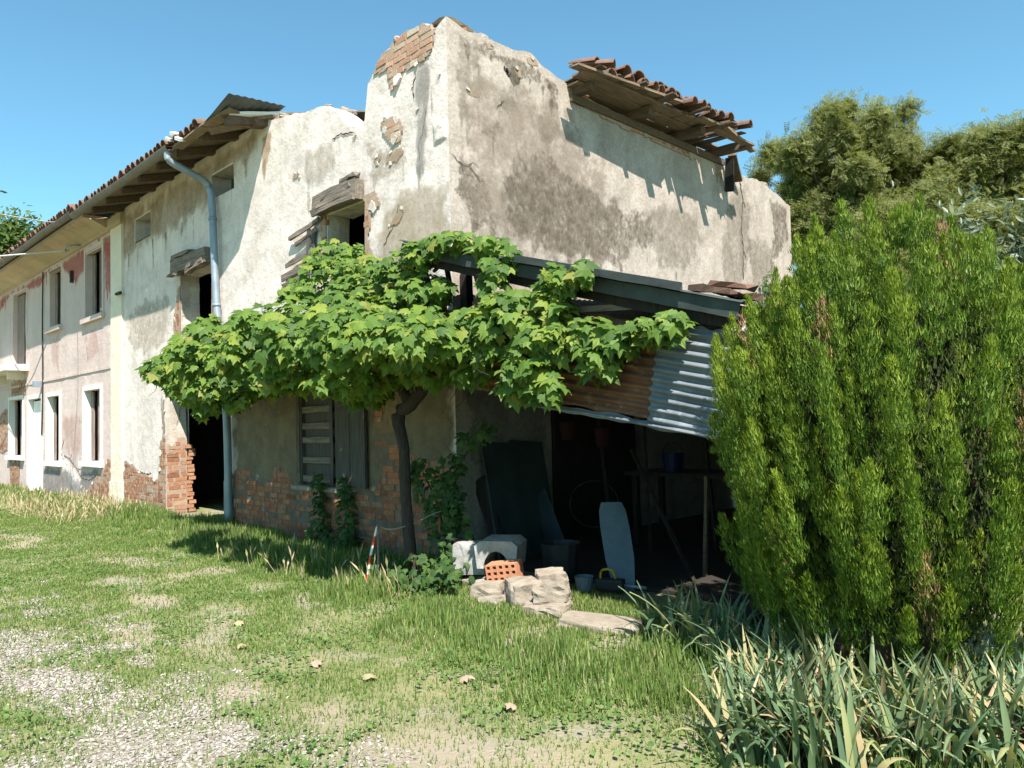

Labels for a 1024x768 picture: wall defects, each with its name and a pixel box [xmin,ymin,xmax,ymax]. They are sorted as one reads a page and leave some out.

flaking render [373,22,436,91]
spalling [374,115,404,166]
water stain [457,44,696,278]
flaking render [363,191,380,261]
crack [739,182,747,279]
corrosion [571,313,634,327]
corrosion [557,348,657,418]
flaking render [61,398,188,513]
flaking render [224,399,457,561]